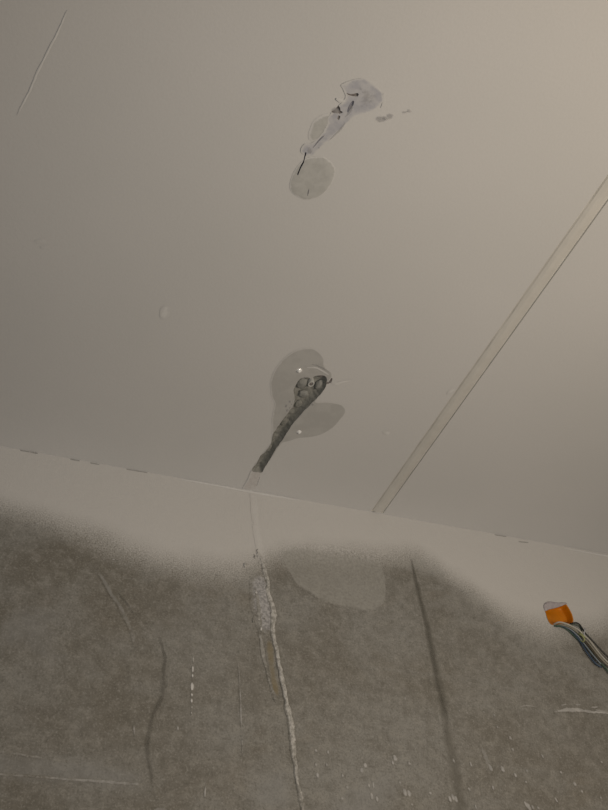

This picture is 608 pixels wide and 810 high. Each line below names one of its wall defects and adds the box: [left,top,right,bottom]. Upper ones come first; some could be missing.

spalling [332,93,359,120]
spalling [243,367,353,491]
crack [244,492,305,810]